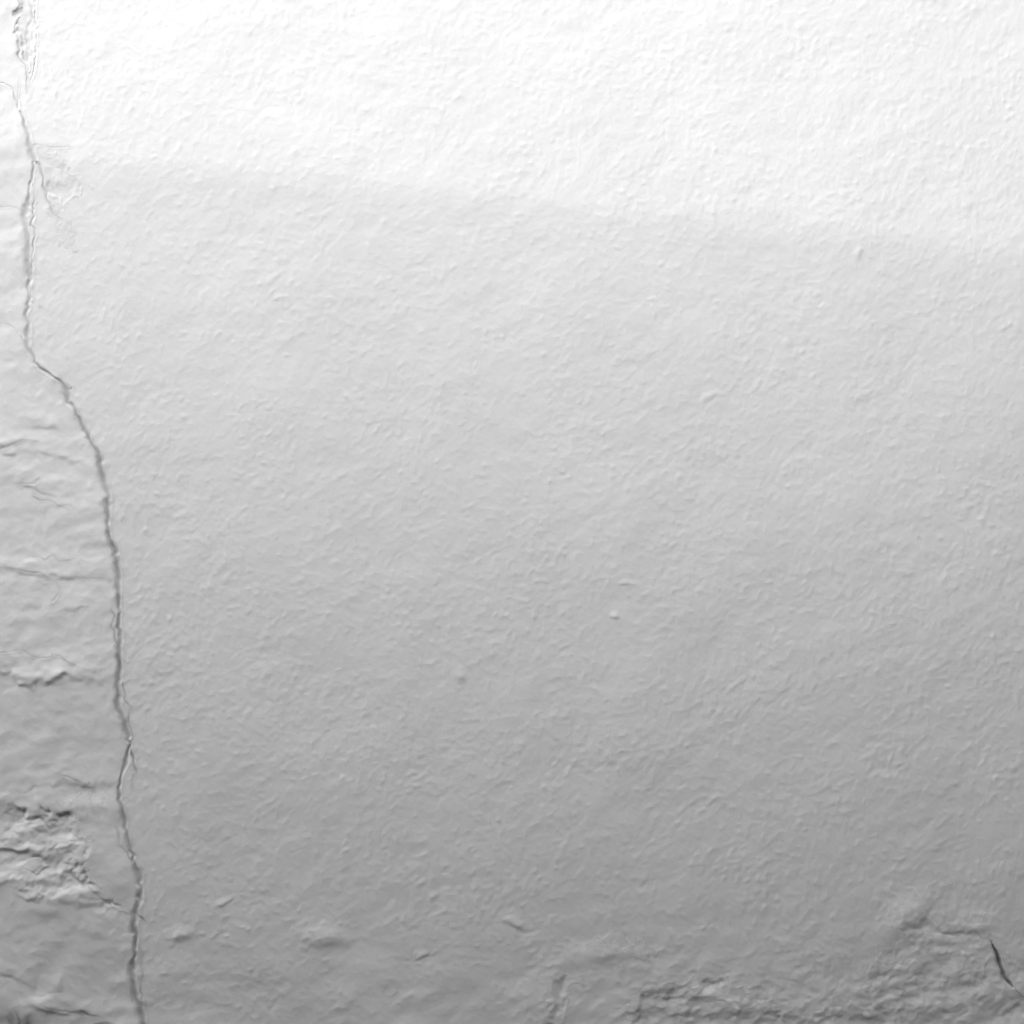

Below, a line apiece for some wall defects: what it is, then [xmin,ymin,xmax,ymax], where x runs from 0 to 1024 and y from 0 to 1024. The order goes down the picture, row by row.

crack [0,0,150,1024]
spalling [0,809,123,916]
crack [982,938,1024,1000]